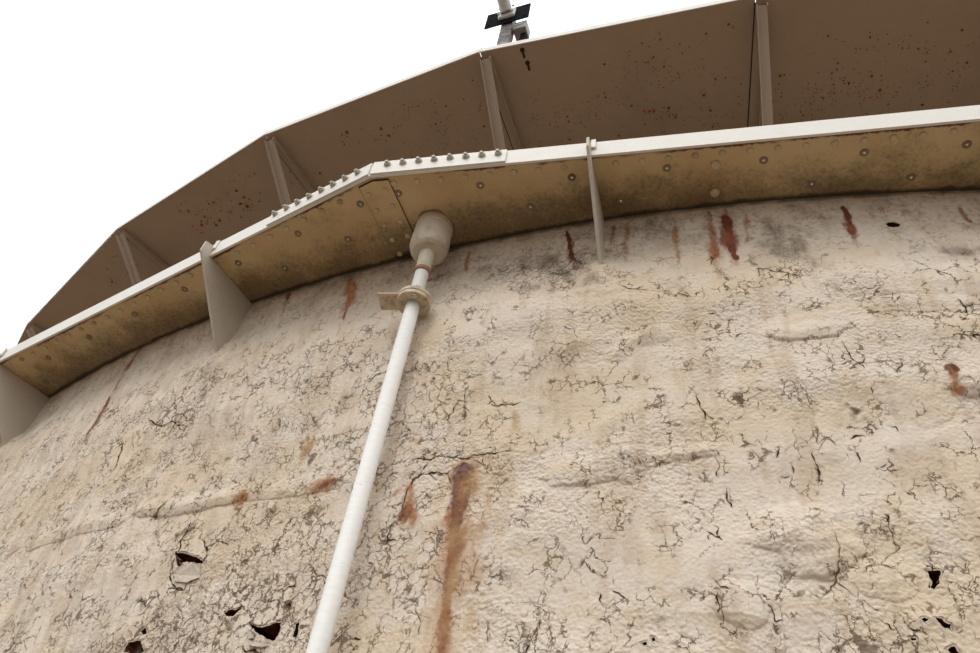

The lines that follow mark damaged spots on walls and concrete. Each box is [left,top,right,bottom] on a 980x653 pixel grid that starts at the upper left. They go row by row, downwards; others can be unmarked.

rust [565,230,576,260]
rust [709,210,749,260]
rust [841,206,856,238]
rust [343,279,356,318]
rust [944,364,965,394]
crack [777,429,886,483]
crack [715,459,733,508]
peeling [174,564,200,583]
rust [438,461,477,653]
crack [827,530,856,597]
crack [866,514,900,571]